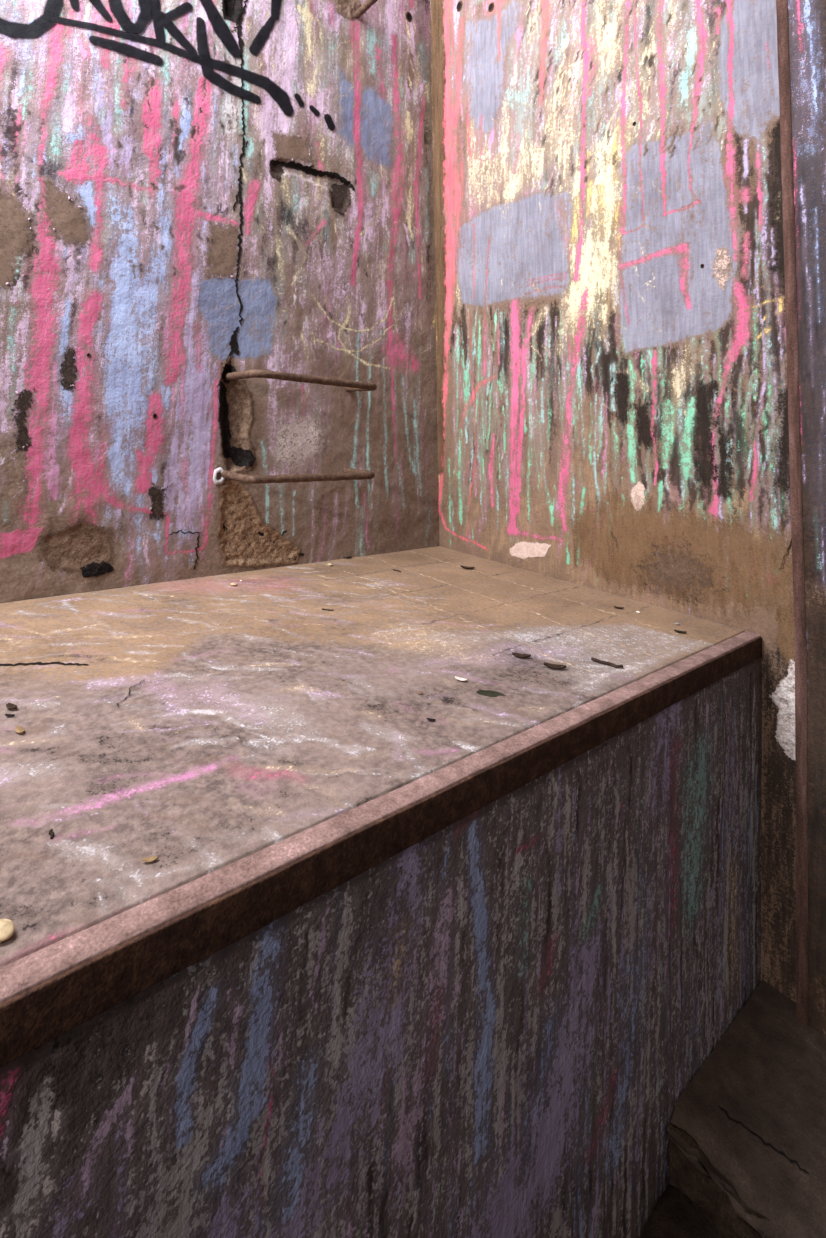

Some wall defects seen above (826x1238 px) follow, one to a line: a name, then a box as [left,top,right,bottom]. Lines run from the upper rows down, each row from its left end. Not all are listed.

crack [226,0,355,361]
peeling [0,173,94,292]
flaking render [38,519,115,574]
flaking render [216,481,301,569]
crack [0,659,89,667]